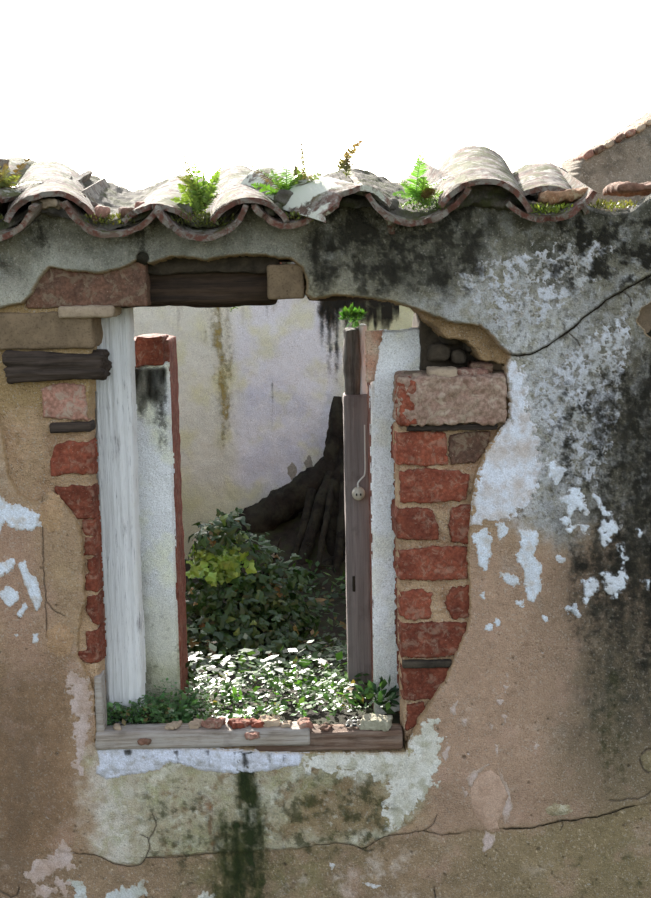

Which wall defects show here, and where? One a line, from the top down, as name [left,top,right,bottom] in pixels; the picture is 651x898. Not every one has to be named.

crack [512,275,651,357]
peeling [470,308,650,618]
peeling [0,496,42,531]
leakage [558,357,651,668]
peeling [0,558,43,618]
leakage [239,751,251,795]
peeling [65,669,451,832]
peeling [23,839,87,898]
peeling [106,879,148,898]
crack [76,814,227,867]
crack [317,815,460,852]
spalling [461,764,513,852]